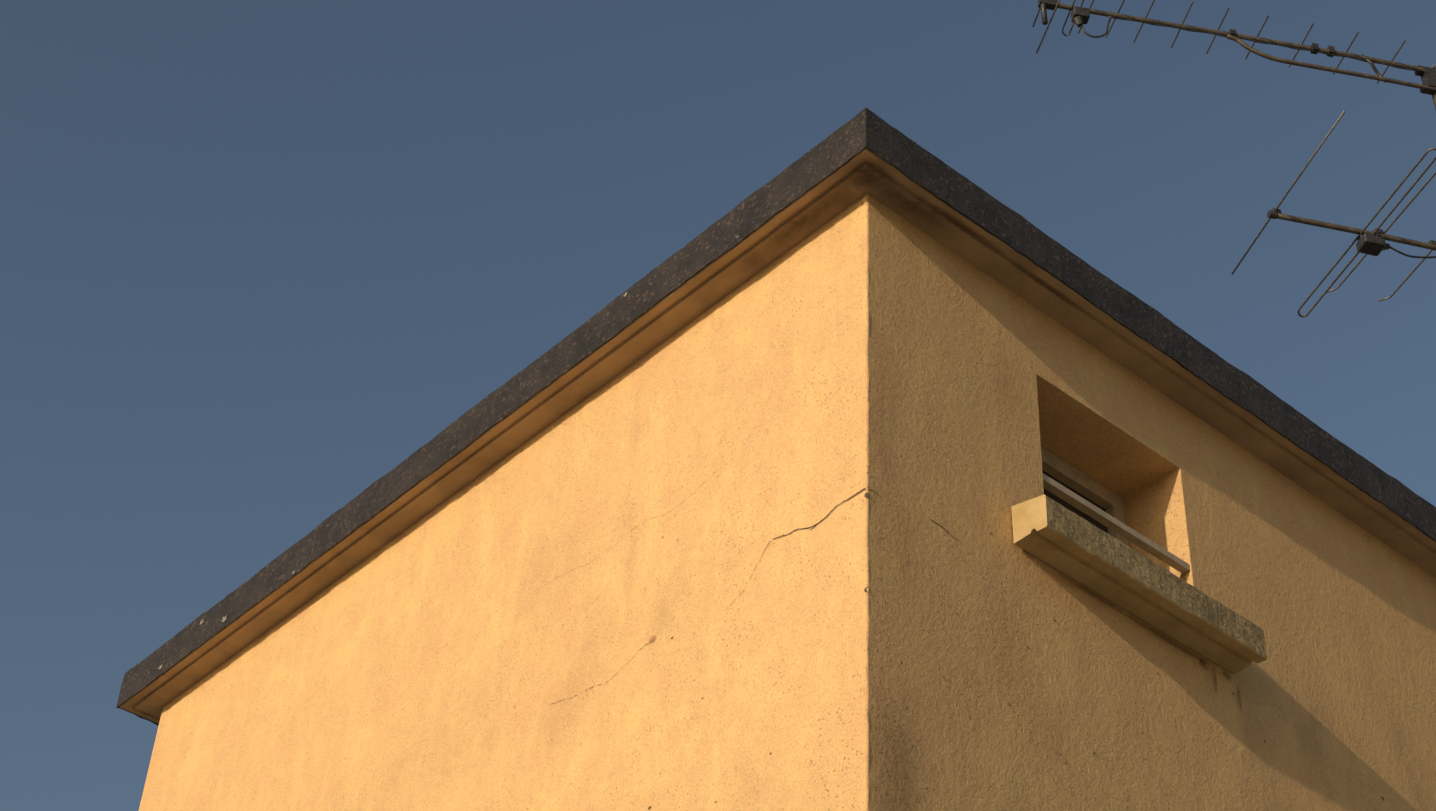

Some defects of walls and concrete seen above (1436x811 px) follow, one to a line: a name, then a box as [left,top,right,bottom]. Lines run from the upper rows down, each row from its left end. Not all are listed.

crack [774,488,880,539]